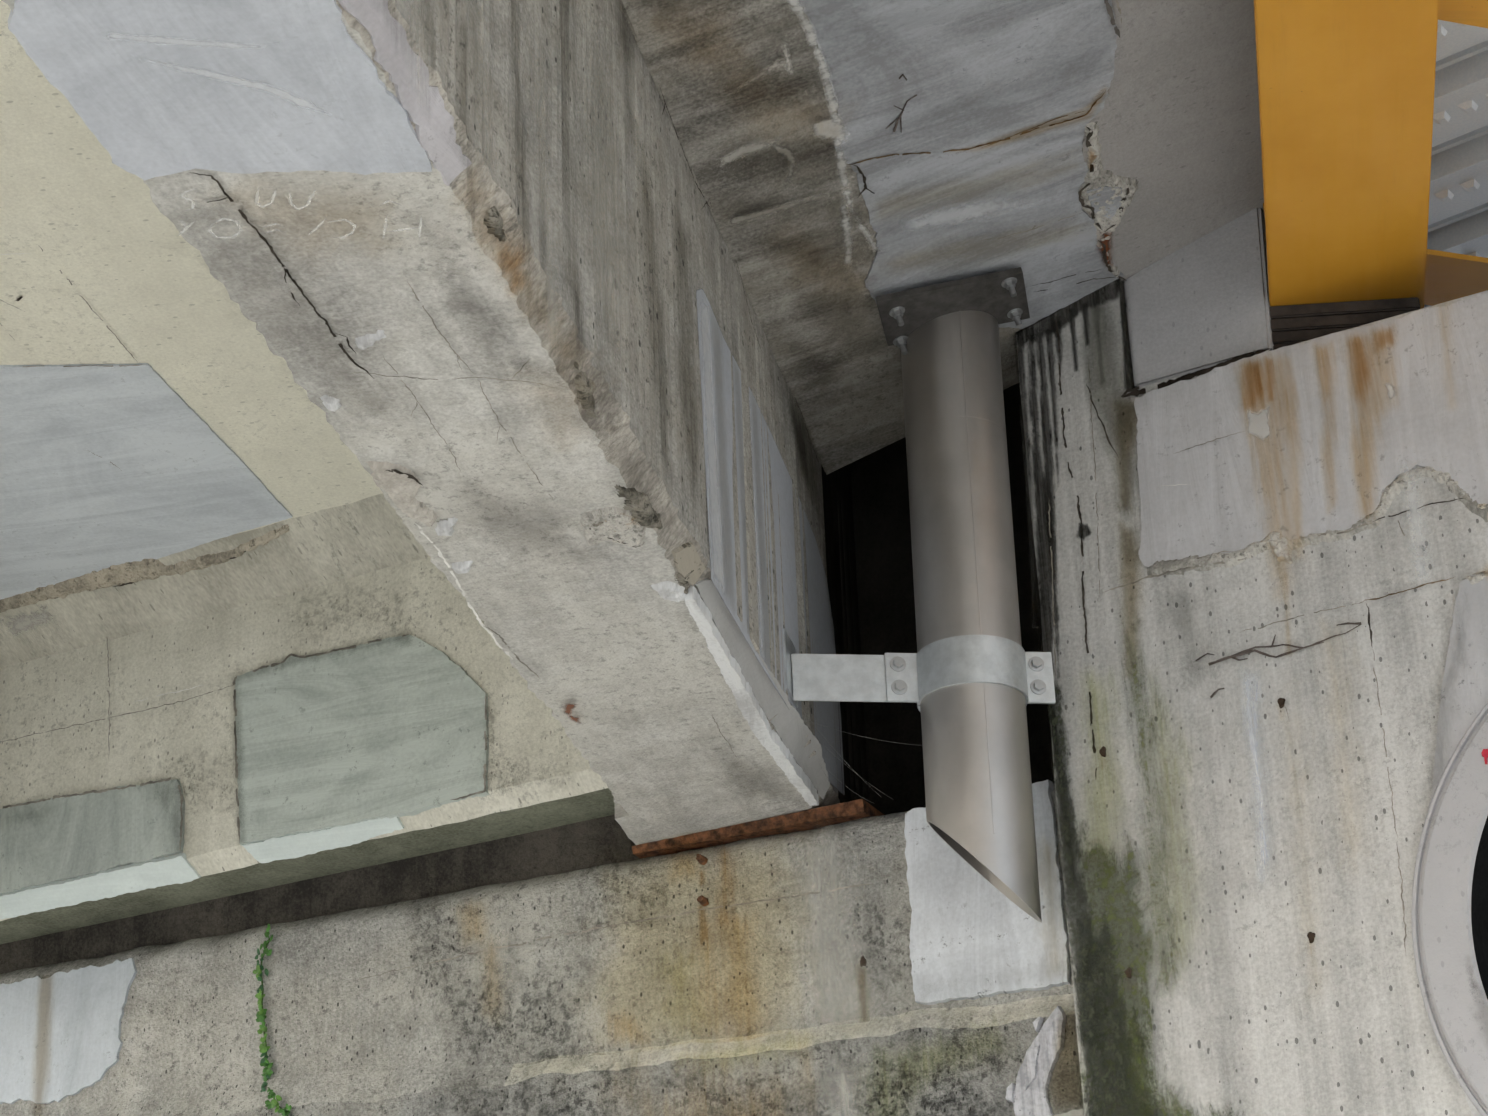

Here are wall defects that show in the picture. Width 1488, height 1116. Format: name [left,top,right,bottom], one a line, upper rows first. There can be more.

crack [847,90,1106,197]
spalling [1078,121,1139,281]
damp [1015,278,1130,666]
rust [1248,409,1269,438]
peeling [1102,466,1488,593]
crack [1243,577,1454,952]
damp [1048,644,1178,1116]
peeling [1005,1006,1067,1116]